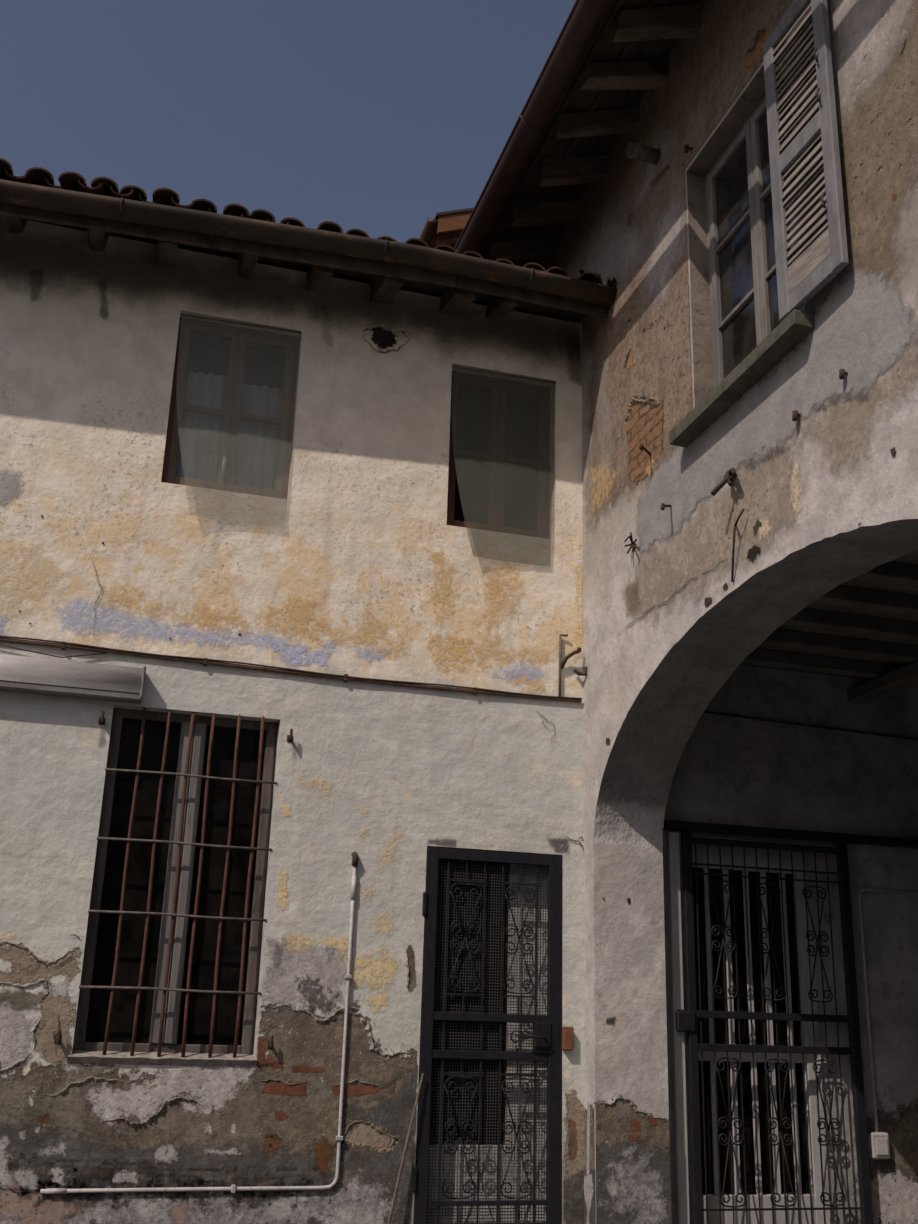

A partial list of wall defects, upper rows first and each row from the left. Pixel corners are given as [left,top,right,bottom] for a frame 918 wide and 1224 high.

peeling [540,0,791,522]
hole [363,325,411,353]
peeling [625,339,918,620]
peeling [59,584,404,666]
peeling [428,551,549,690]
flaking render [0,913,418,1224]
flaking render [563,1089,672,1224]
flaking render [853,1100,918,1224]